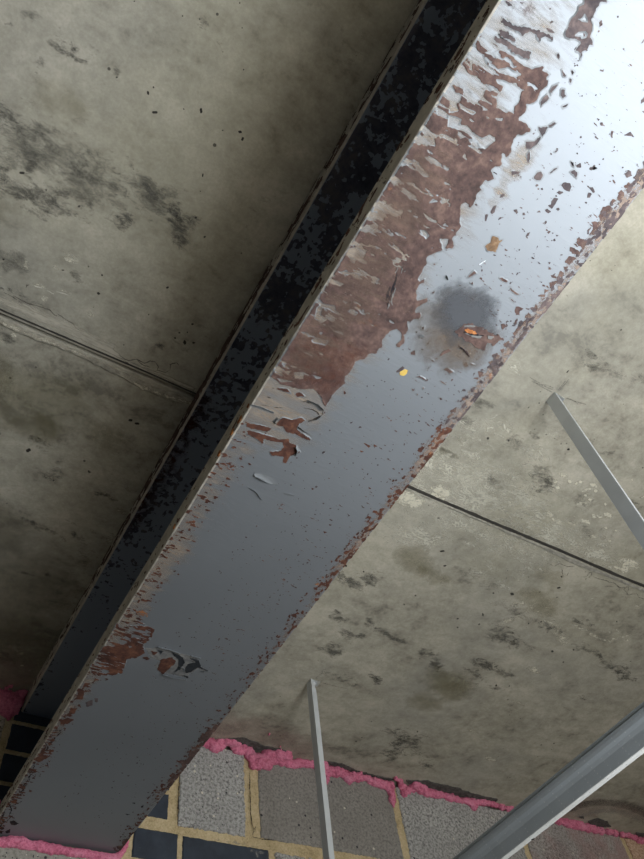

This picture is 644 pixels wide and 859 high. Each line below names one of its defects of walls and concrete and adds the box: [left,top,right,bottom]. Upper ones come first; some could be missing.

corrosion [0,306,309,832]
corrosion [46,0,422,664]
peeling [0,0,608,629]
corrosion [114,161,644,852]
corrosion [424,30,475,105]